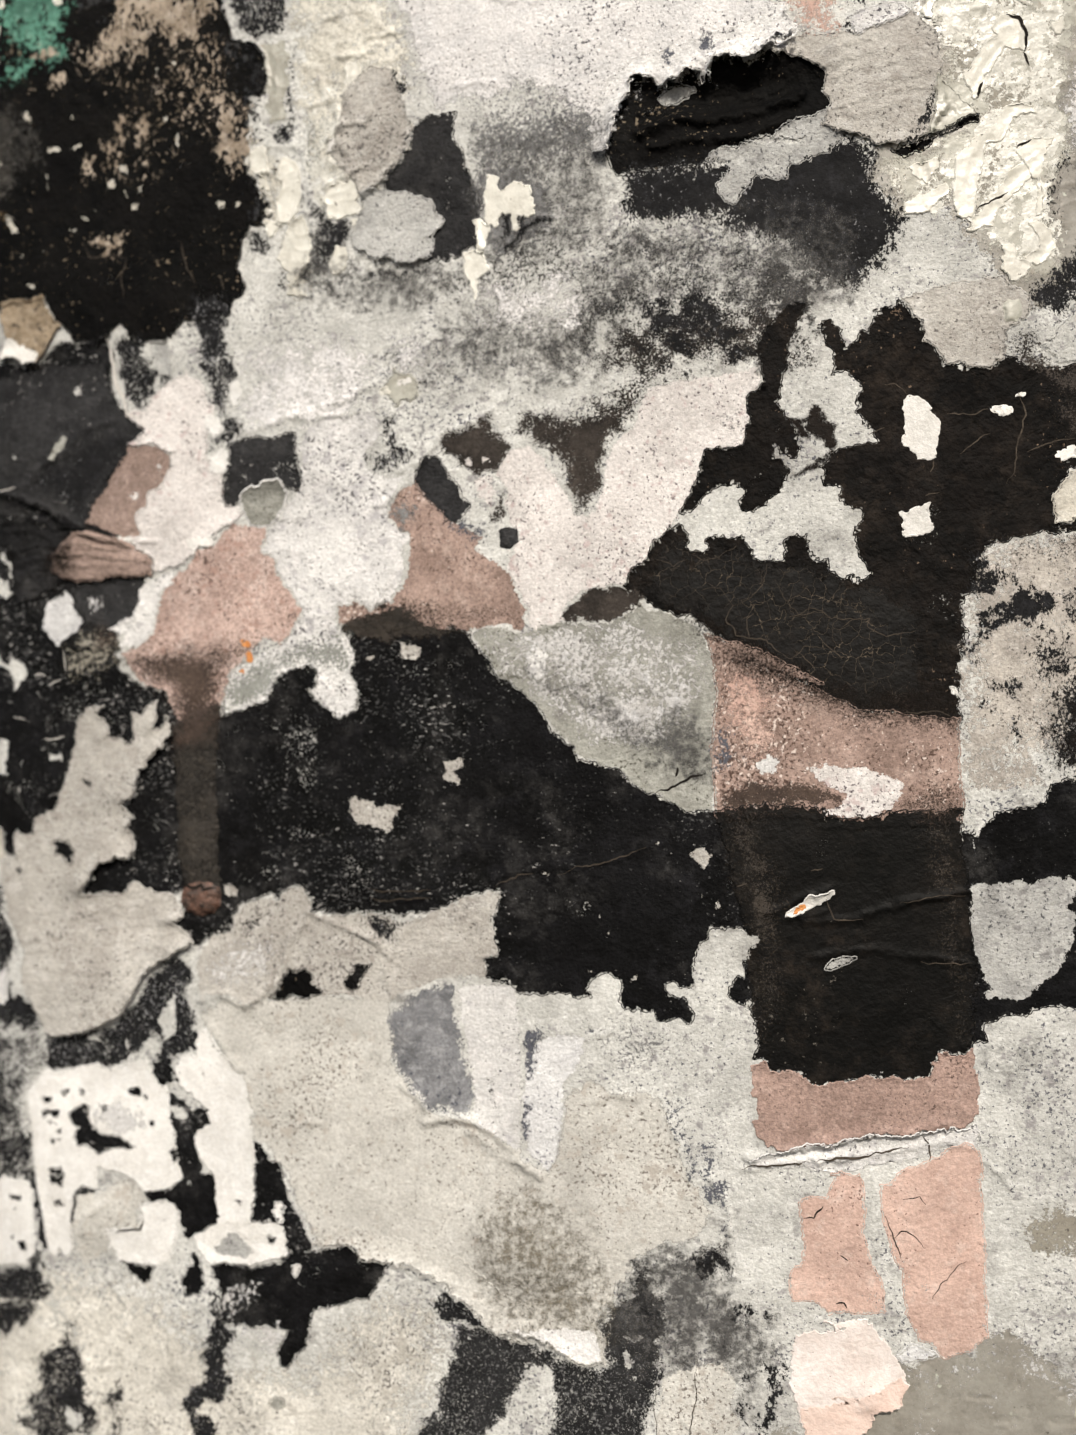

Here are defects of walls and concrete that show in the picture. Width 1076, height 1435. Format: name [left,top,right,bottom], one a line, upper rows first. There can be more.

peeling [657,78,697,106]
peeling [847,0,1076,284]
peeling [125,994,177,1062]
peeling [203,1220,270,1259]